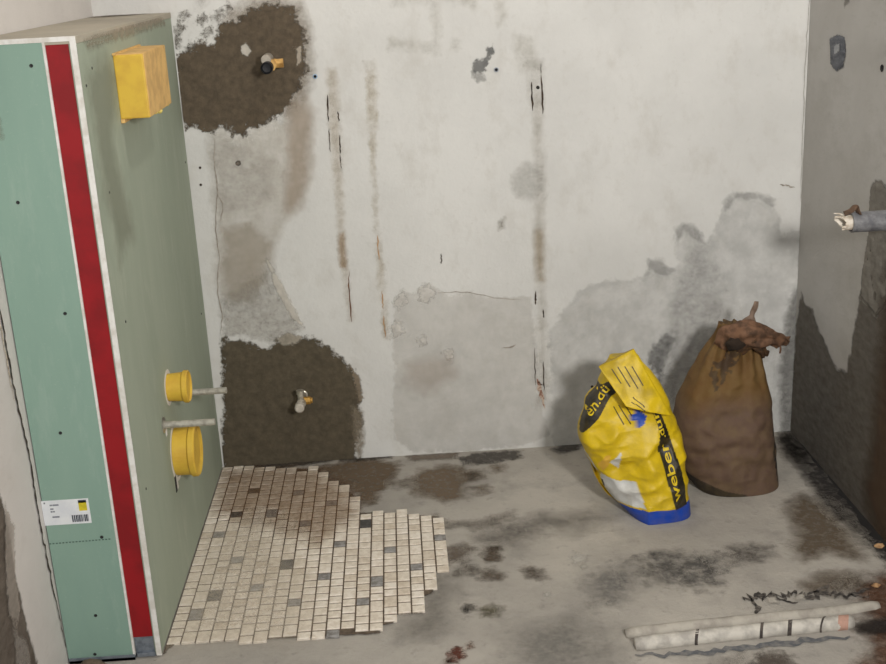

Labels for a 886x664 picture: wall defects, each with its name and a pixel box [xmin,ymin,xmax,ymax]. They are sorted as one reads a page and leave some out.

peeling [174,5,233,52]
peeling [350,366,363,404]
crack [0,310,66,646]